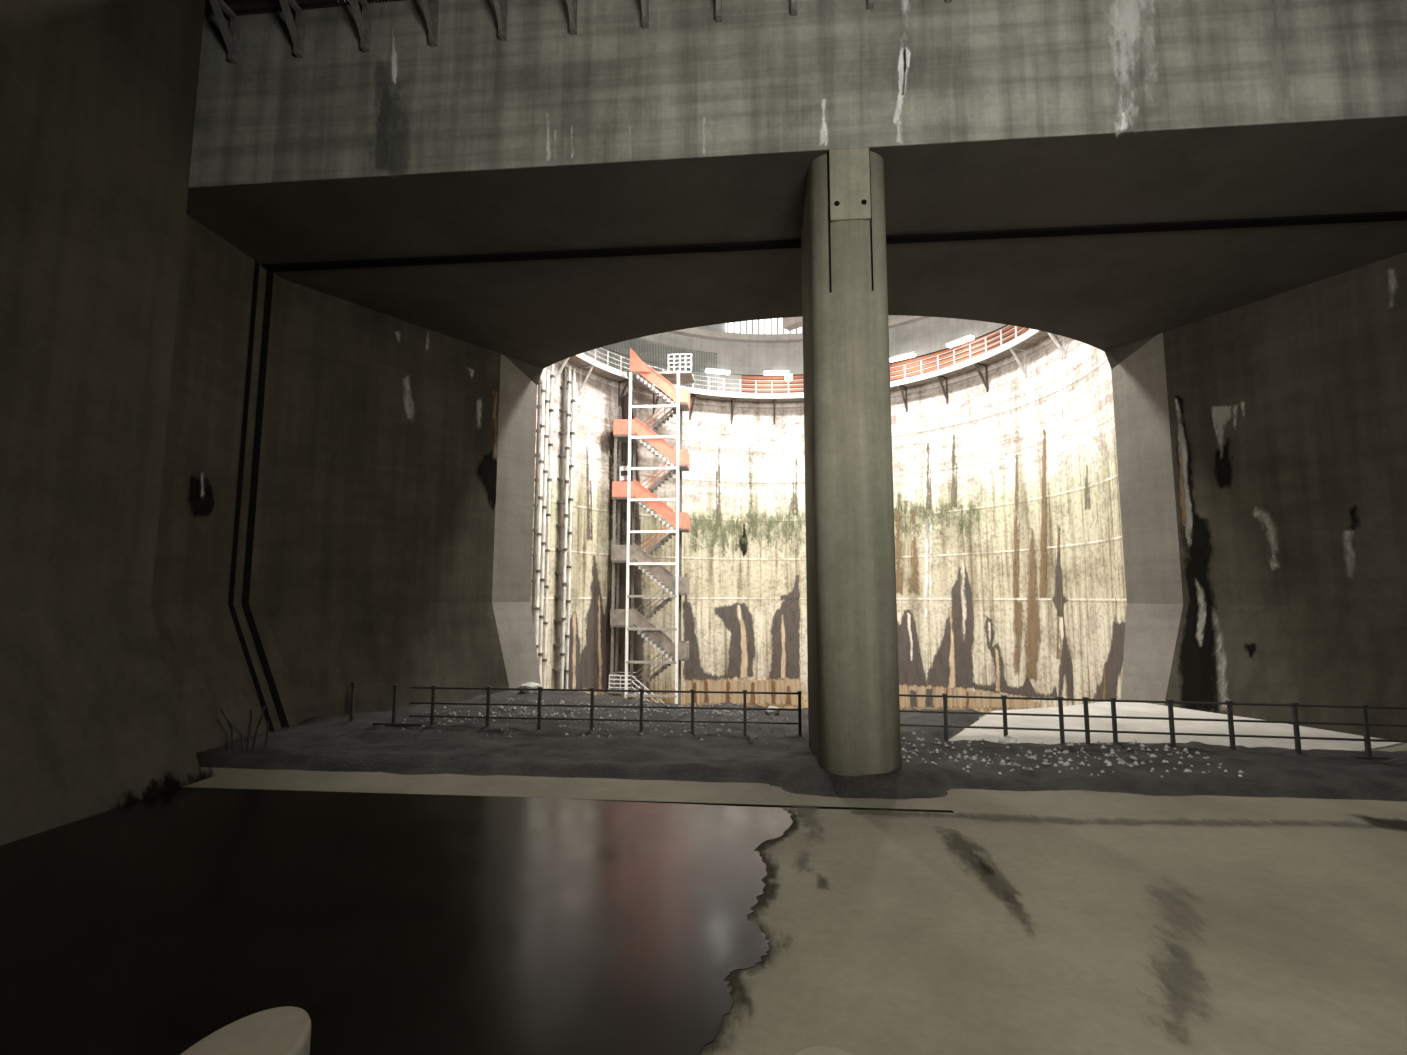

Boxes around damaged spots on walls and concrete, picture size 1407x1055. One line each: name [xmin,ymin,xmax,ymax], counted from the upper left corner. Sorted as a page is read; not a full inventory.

water stain [1109,0,1154,130]
water stain [564,393,645,690]
water stain [694,446,771,556]
water stain [789,458,798,539]
water stain [897,362,1073,699]
water stain [683,575,800,681]
water stain [1093,598,1125,702]